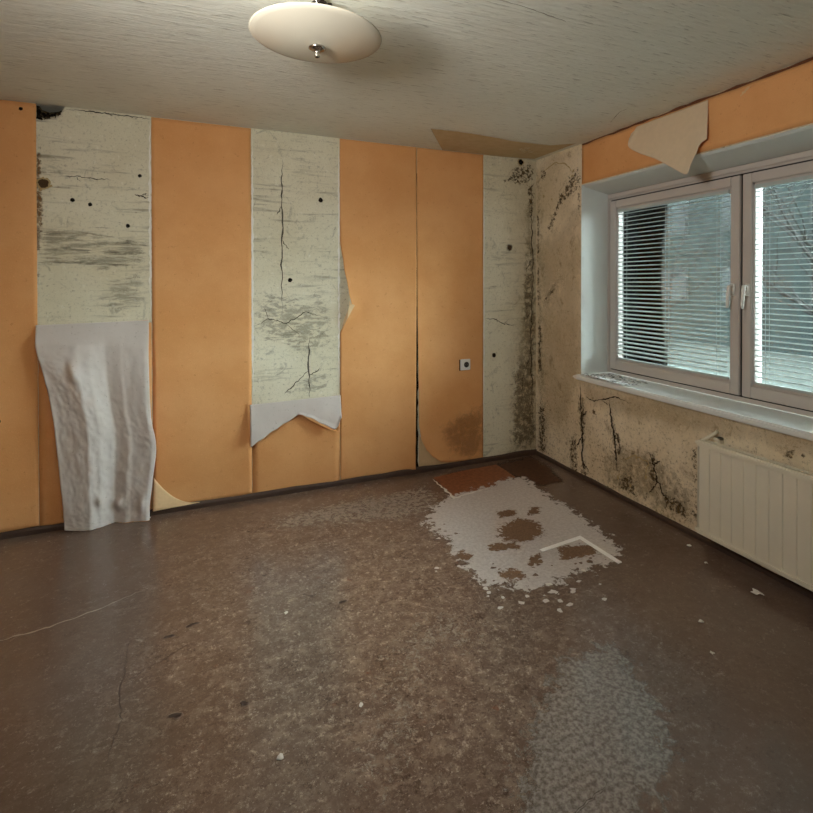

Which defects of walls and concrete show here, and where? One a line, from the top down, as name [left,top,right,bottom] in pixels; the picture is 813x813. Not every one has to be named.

flaking render [36,105,64,121]
peeling [628,100,708,175]
leakage [504,165,546,283]
leakage [549,169,580,229]
crack [254,165,319,397]
peeling [35,320,199,531]
peeling [247,395,342,447]
leakage [570,397,596,476]
crack [577,387,630,474]
peeling [420,476,622,612]
crack [649,455,669,501]
leakage [664,492,697,521]